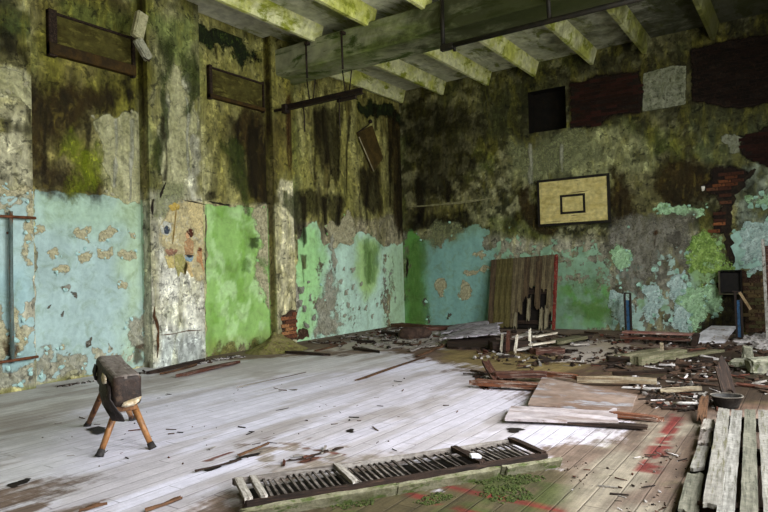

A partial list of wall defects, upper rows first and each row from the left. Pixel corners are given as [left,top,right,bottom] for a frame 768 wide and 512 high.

flaking render [690,35,768,109]
peeling [0,182,46,266]
water stain [27,76,134,198]
peeling [73,225,137,263]
water stain [283,103,351,245]
peeling [281,210,363,341]
water stain [515,186,557,236]
flaking render [510,71,644,185]
water stain [609,167,637,224]
water stain [654,161,713,208]
flaking render [608,165,768,333]
peeling [0,307,92,388]